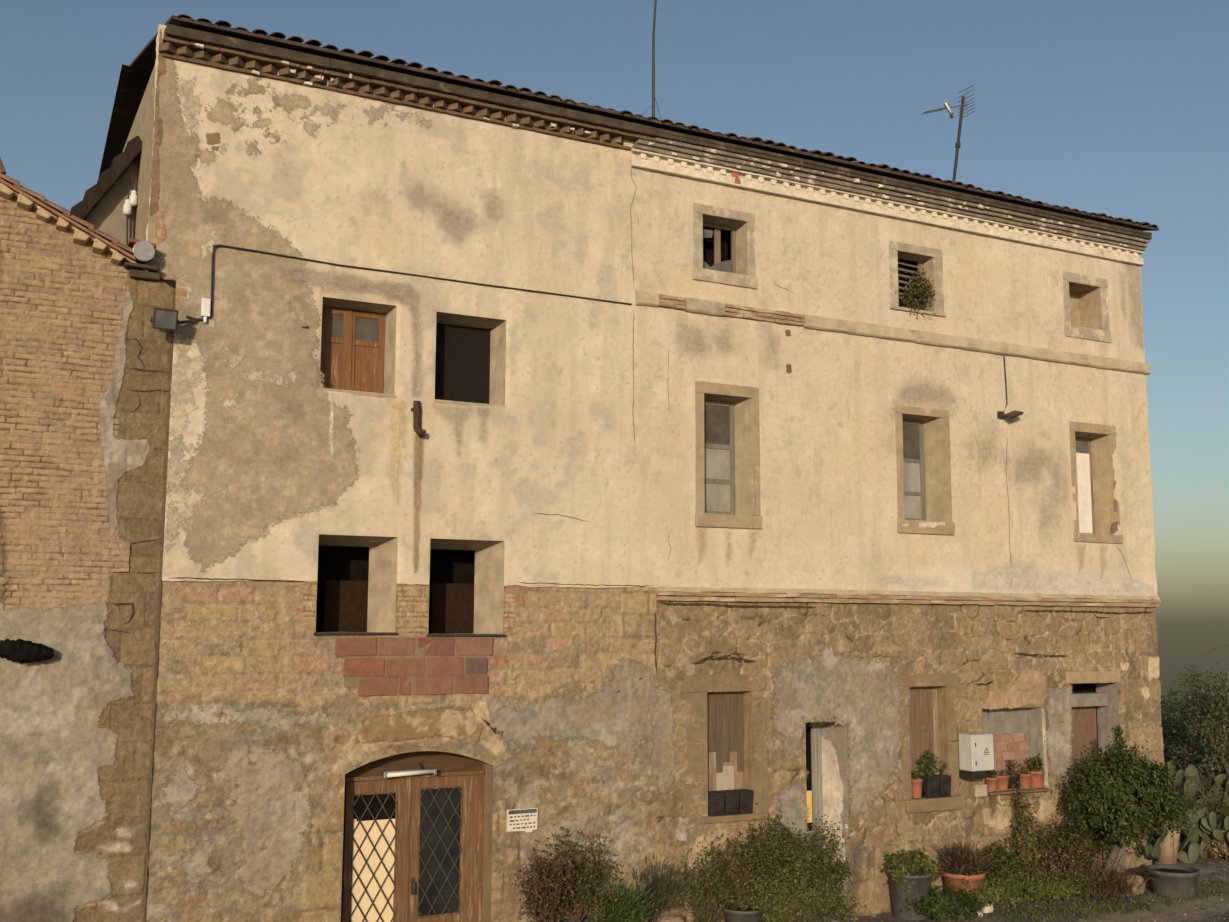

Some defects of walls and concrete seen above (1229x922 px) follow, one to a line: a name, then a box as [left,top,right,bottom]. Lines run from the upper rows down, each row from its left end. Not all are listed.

crack [630,169,639,286]
peeling [146,30,431,573]
crack [629,318,637,442]
crack [534,513,589,522]